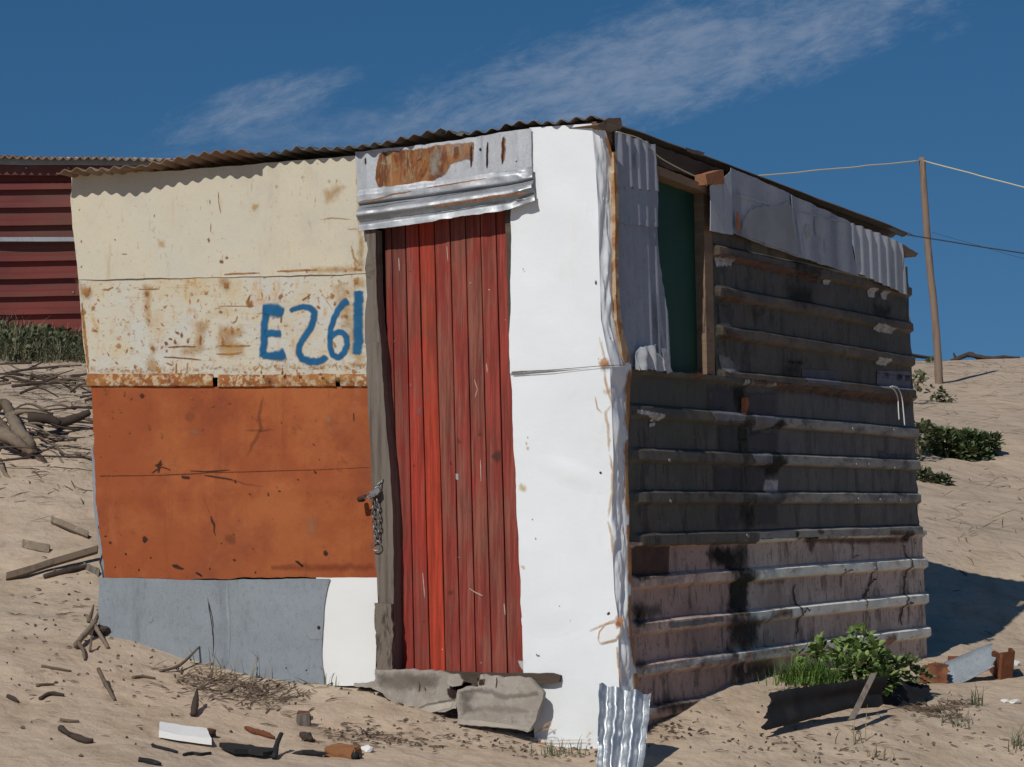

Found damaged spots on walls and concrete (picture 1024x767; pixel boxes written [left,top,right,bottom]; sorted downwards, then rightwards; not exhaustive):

rust [359,142,486,202]
rust [278,217,362,318]
rust [81,287,113,372]
rust [105,316,250,374]
rust [244,354,364,380]
damp [706,546,765,657]
crack [793,585,811,637]
crack [841,544,878,608]
crack [900,546,914,625]